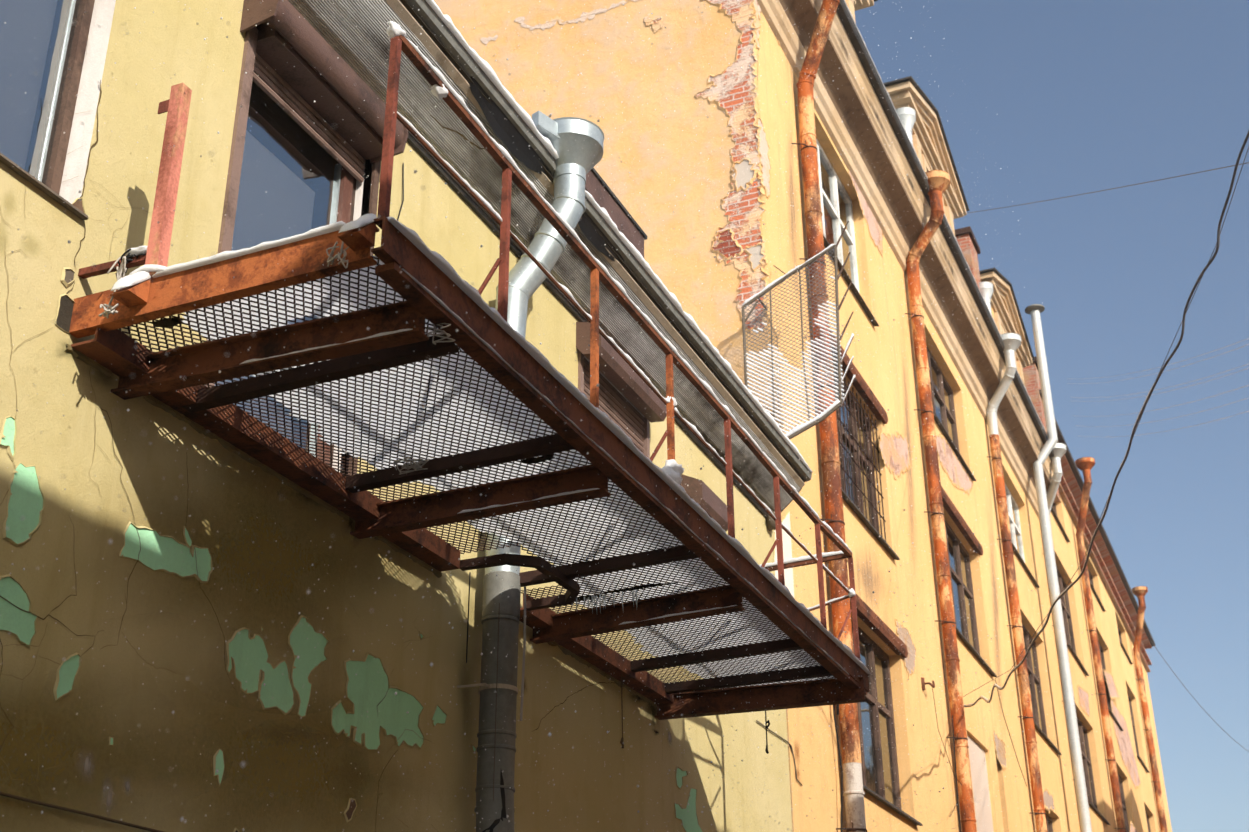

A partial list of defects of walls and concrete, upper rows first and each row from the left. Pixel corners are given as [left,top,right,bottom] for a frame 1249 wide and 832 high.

flaking render [514,0,637,30]
flaking render [694,0,786,333]
crack [0,187,53,419]
peeling [0,415,44,547]
peeling [0,574,38,648]
crack [0,367,175,801]
peeling [119,522,213,583]
peeling [53,652,81,701]
peeling [226,615,329,717]
peeling [331,652,448,750]
peeling [213,748,225,786]